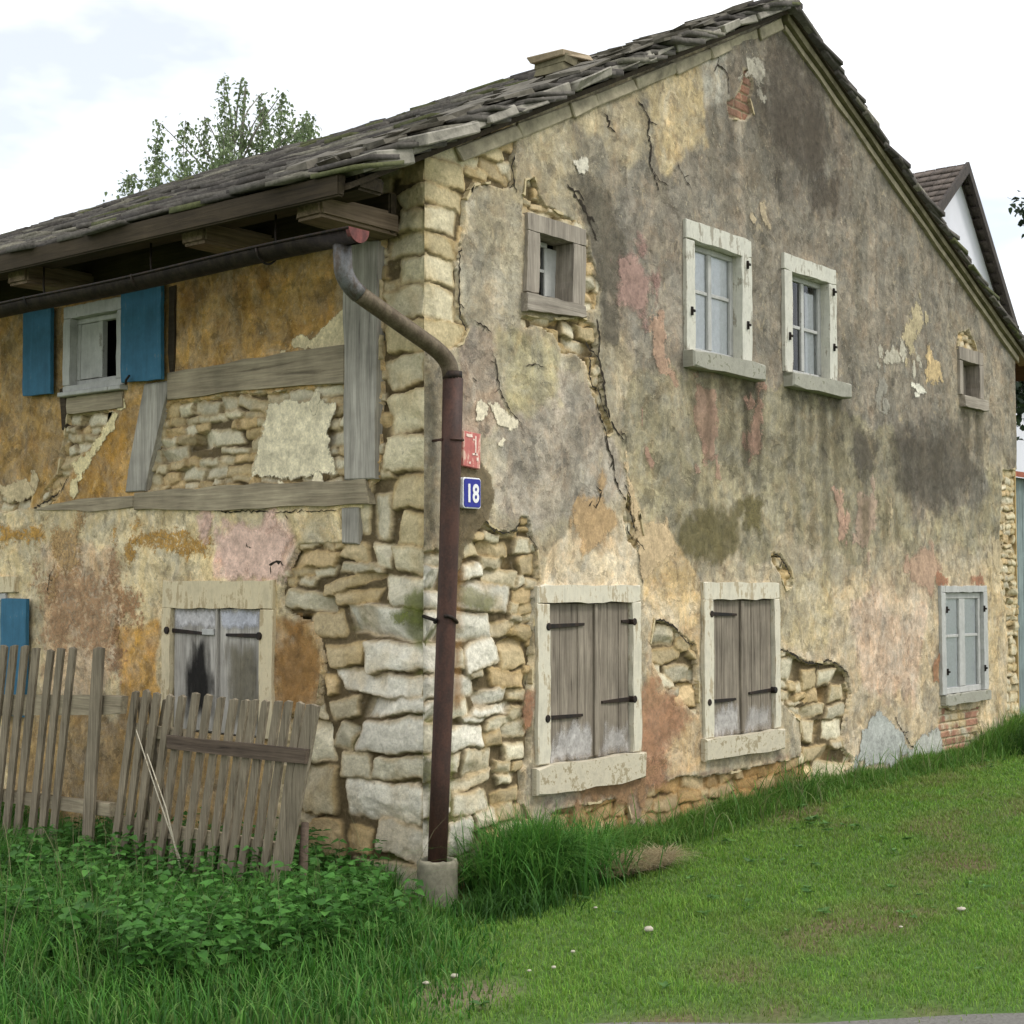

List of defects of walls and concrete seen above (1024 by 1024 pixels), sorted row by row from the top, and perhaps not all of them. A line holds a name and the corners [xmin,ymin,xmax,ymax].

crack [567,184,597,240]
crack [638,101,691,191]
crack [458,248,520,422]
peeling [476,400,519,447]
flaking render [521,240,614,437]
crack [586,320,645,550]
water stain [743,494,763,530]
peeling [876,293,943,414]
flaking render [0,323,439,895]
flaking render [447,517,539,888]
flaking render [650,618,700,714]
flaking render [551,650,854,835]